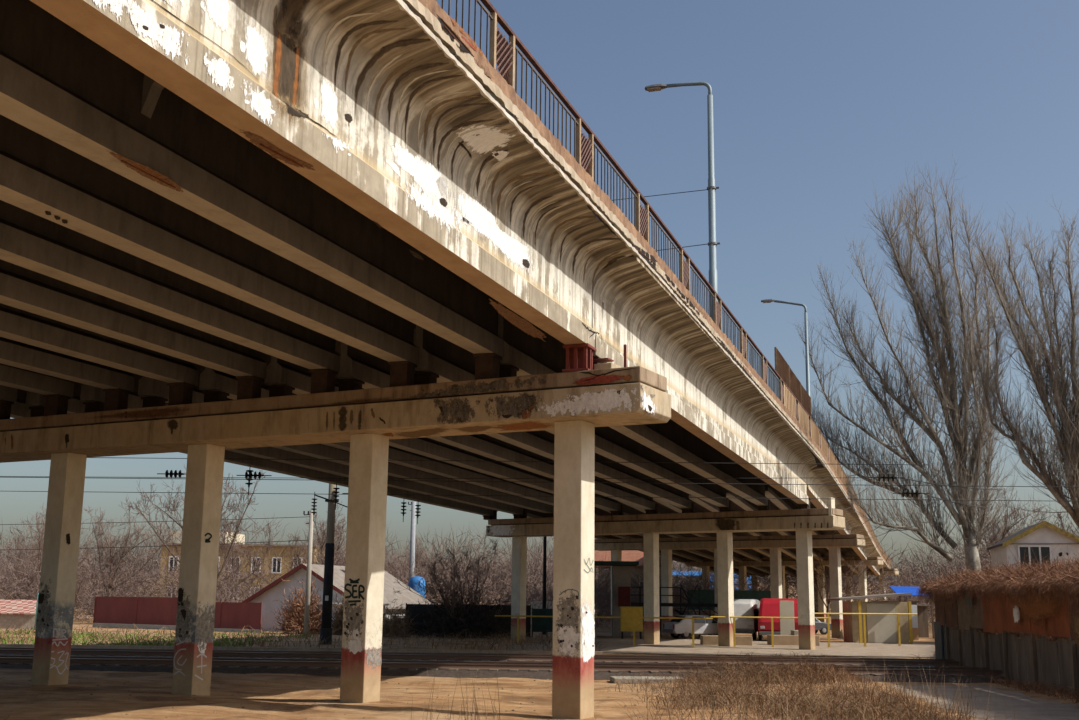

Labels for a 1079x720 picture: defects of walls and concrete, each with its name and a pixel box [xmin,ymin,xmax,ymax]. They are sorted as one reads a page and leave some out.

peeling [93,0,190,65]
peeling [200,0,229,32]
peeling [204,20,275,126]
rust [272,34,304,123]
damp [273,0,310,107]
spalling [241,132,313,170]
peeling [285,78,354,156]
peeling [426,385,658,424]
rust [575,375,632,385]
peeling [35,581,53,639]
peeling [344,599,382,669]
peeling [553,591,595,662]